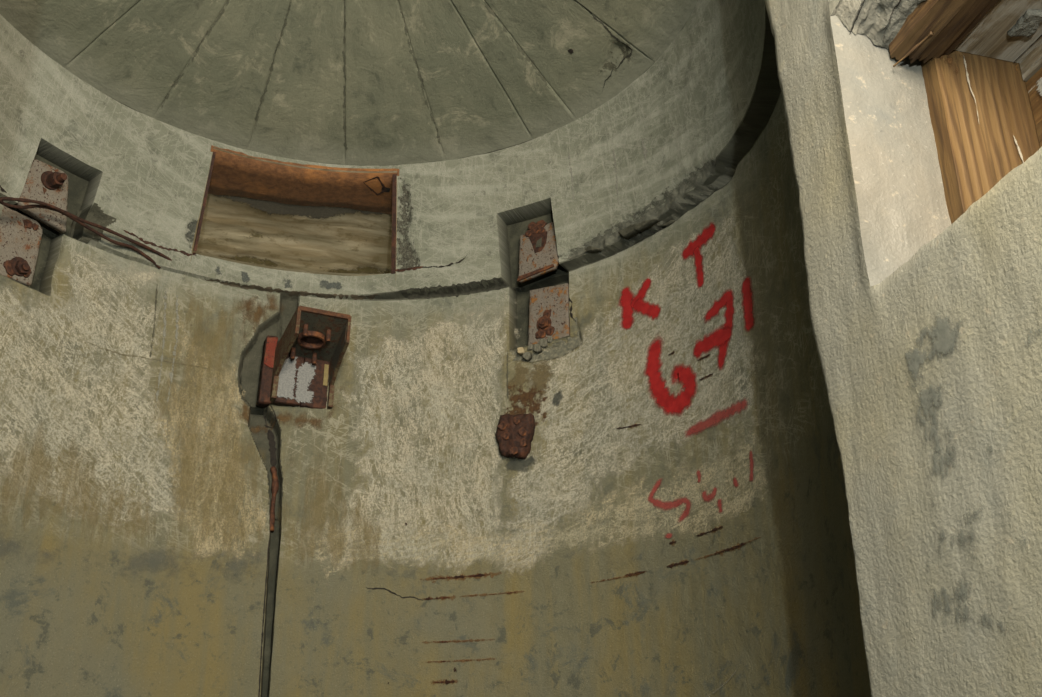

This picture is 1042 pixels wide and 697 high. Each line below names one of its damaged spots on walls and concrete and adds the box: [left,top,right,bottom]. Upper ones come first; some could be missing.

spalling [840,0,926,49]
spalling [558,159,736,262]
rust [667,537,761,568]
rust [421,572,501,582]
rust [424,591,523,600]
rust [427,658,495,685]